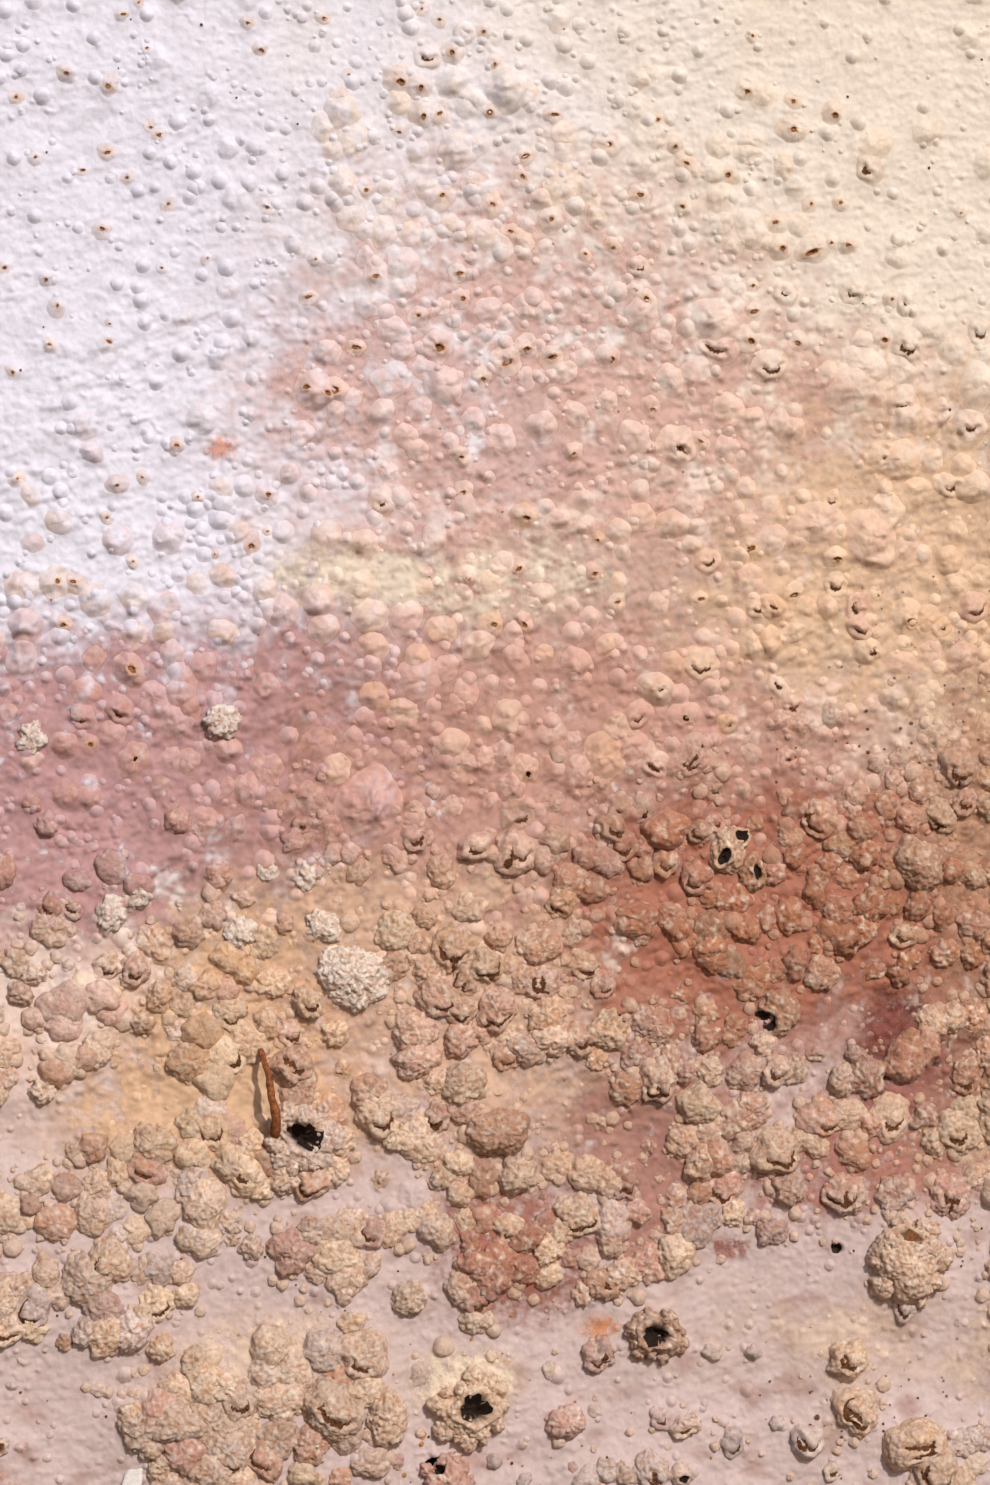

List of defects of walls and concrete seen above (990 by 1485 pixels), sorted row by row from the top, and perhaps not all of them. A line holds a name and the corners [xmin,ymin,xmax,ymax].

leakage [463,259,554,328]
leakage [0,301,990,1485]
corrosion [561,1072,696,1258]
corrosion [540,670,990,1210]